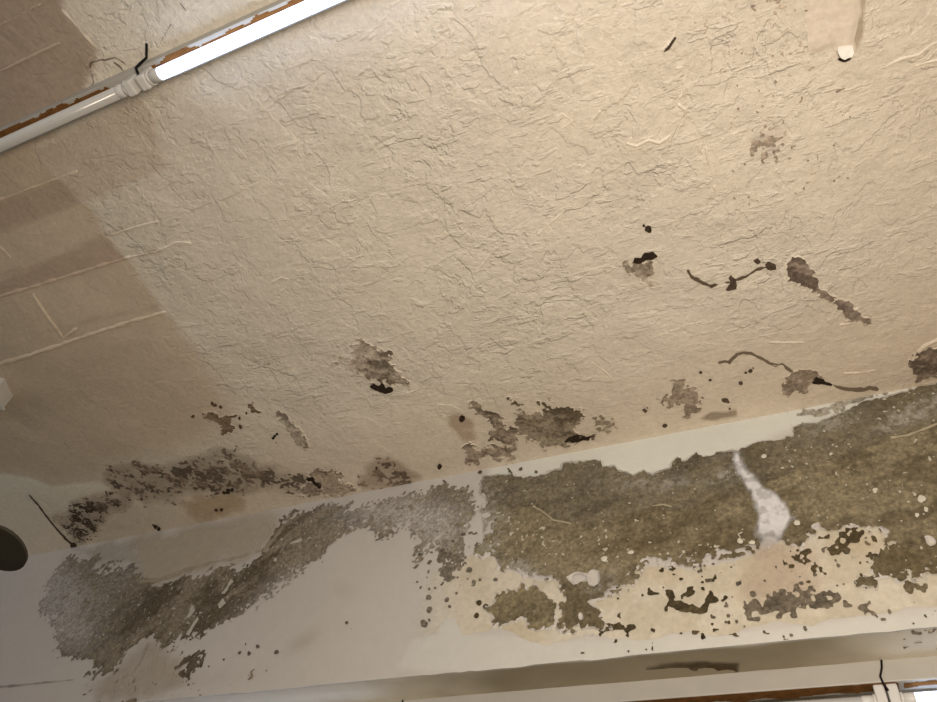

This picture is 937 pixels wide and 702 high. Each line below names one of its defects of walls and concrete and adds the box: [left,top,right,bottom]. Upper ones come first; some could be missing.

peeling [766,0,864,71]
peeling [744,105,796,165]
leakage [53,443,311,542]
leakage [357,457,414,492]
flaking render [36,345,937,702]